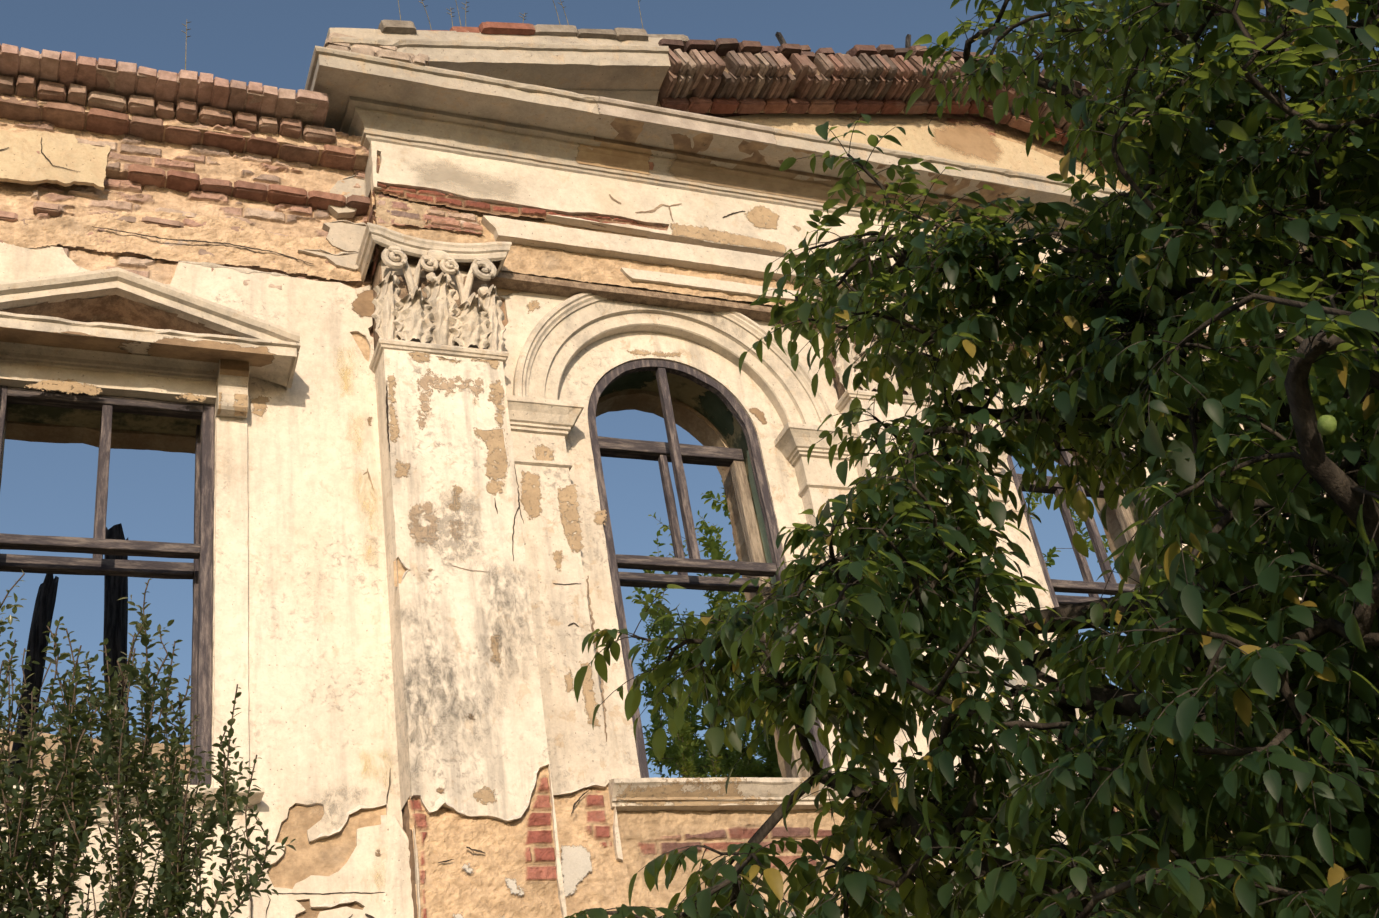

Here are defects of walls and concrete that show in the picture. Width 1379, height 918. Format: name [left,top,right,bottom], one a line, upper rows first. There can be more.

flaking render [576,96,1018,210]
flaking render [0,85,801,361]
peeling [387,375,411,478]
peeling [408,351,607,571]
damp [419,646,478,719]
flaking render [267,804,387,918]
flaking render [408,766,778,918]